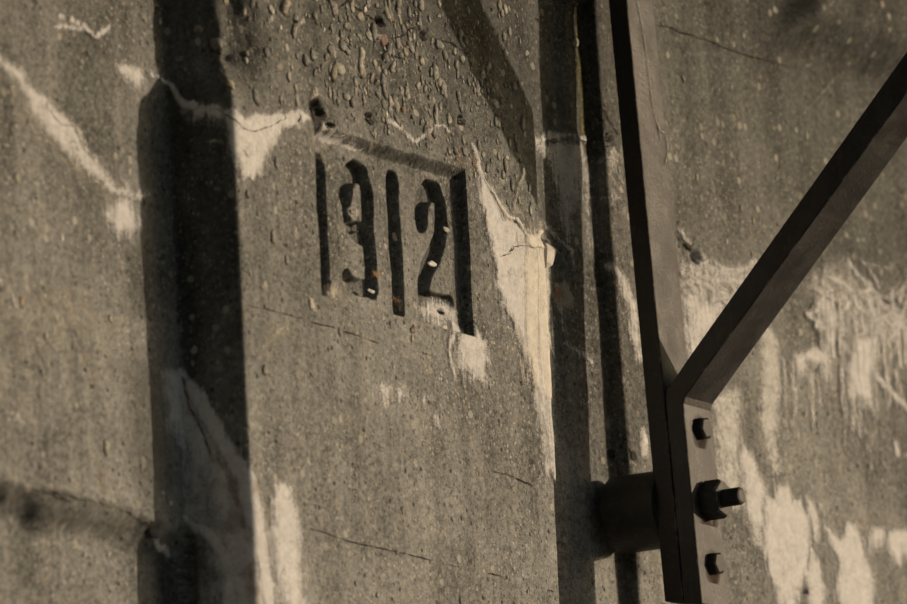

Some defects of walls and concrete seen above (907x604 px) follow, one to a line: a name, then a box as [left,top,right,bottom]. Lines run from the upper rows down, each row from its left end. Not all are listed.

efflorescence [0,57,151,243]
efflorescence [53,14,110,51]
efflorescence [117,62,310,183]
efflorescence [314,131,363,152]
water stain [472,7,620,480]
efflorescence [680,231,758,360]
water stain [161,368,311,604]
efflorescence [712,260,907,604]